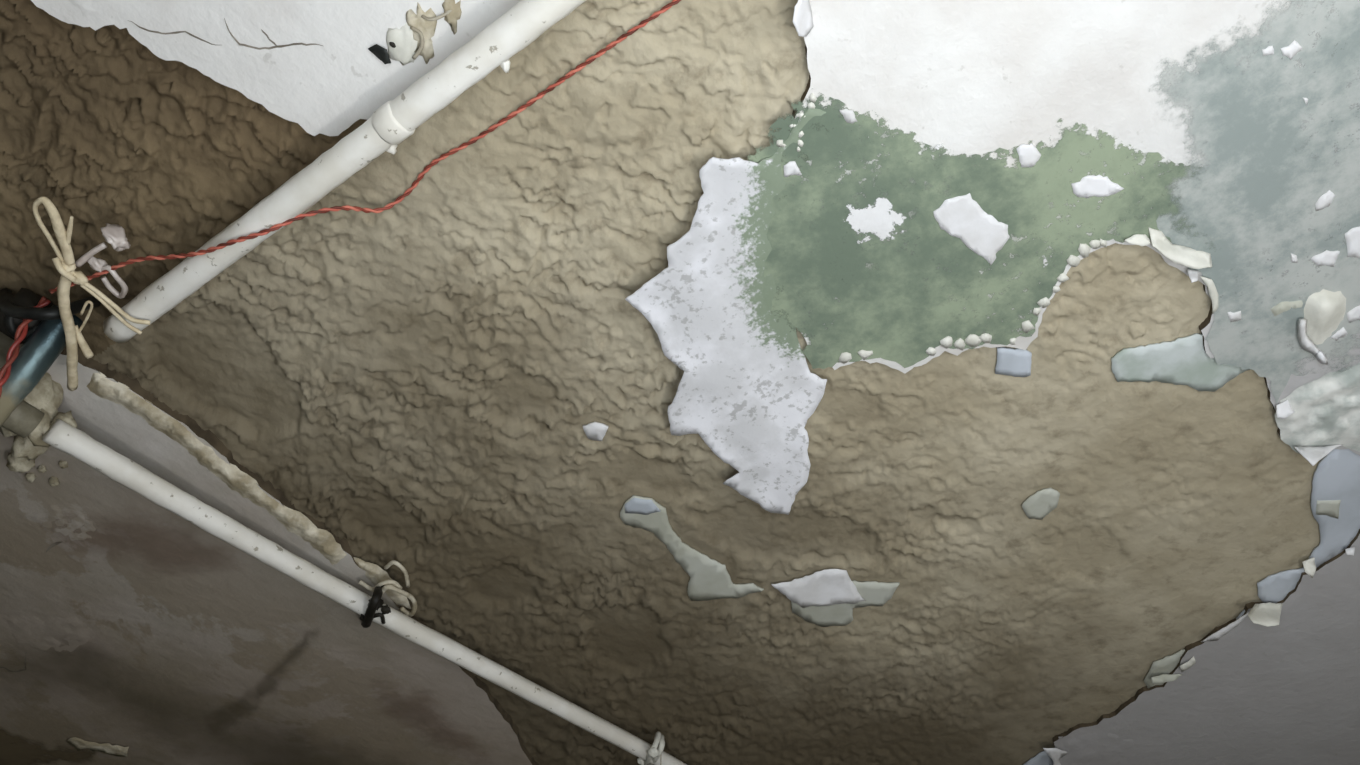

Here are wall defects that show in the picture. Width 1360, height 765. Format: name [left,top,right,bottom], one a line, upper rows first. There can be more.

flaking render [0,0,367,308]
water stain [748,0,1360,403]
peeling [1124,227,1212,269]
flaking render [74,303,116,358]
peeling [625,108,827,515]
peeling [1200,276,1219,314]
peeling [771,569,866,608]
peeling [1248,558,1316,627]
peeling [1201,610,1249,642]
peeling [1144,649,1185,688]
flaking render [474,673,640,765]
water stain [0,730,95,765]